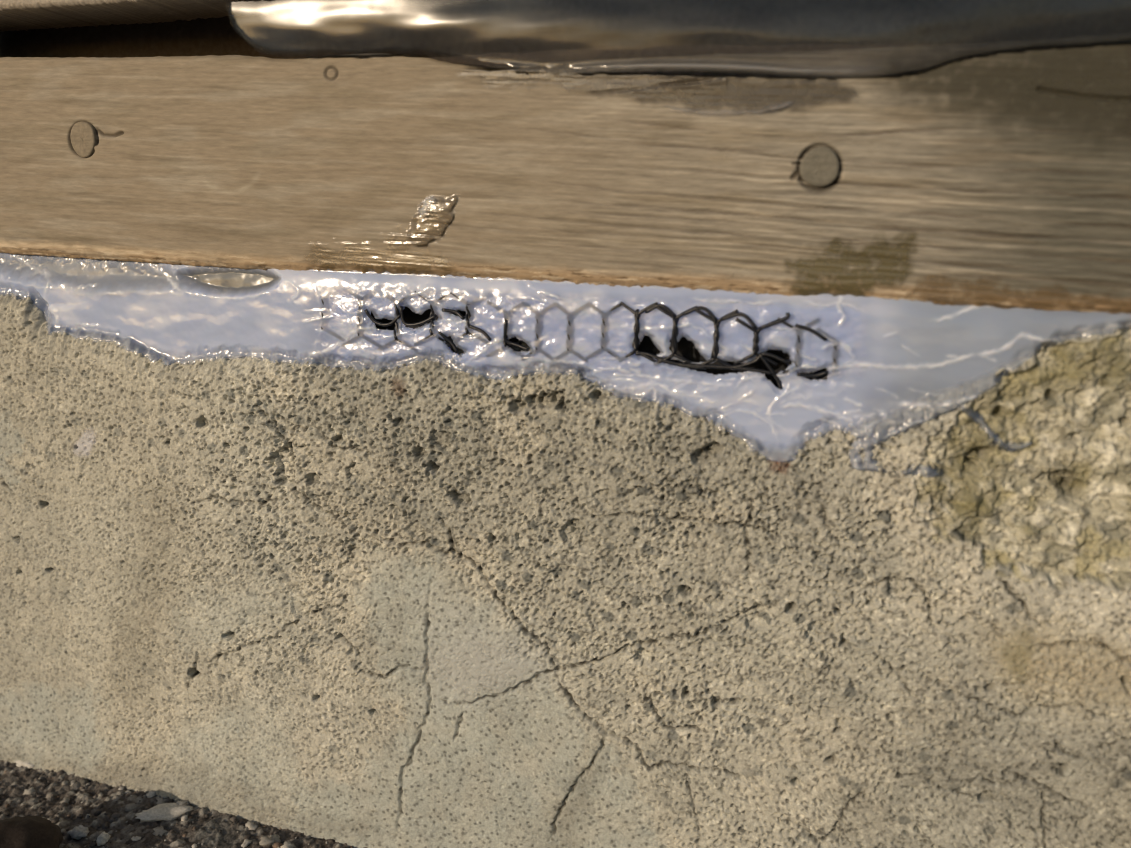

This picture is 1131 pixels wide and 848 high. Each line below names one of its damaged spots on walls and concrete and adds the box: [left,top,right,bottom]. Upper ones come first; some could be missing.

crack [390,520,750,828]
crack [647,501,773,573]
spalling [913,321,1131,588]
crack [1042,641,1129,693]